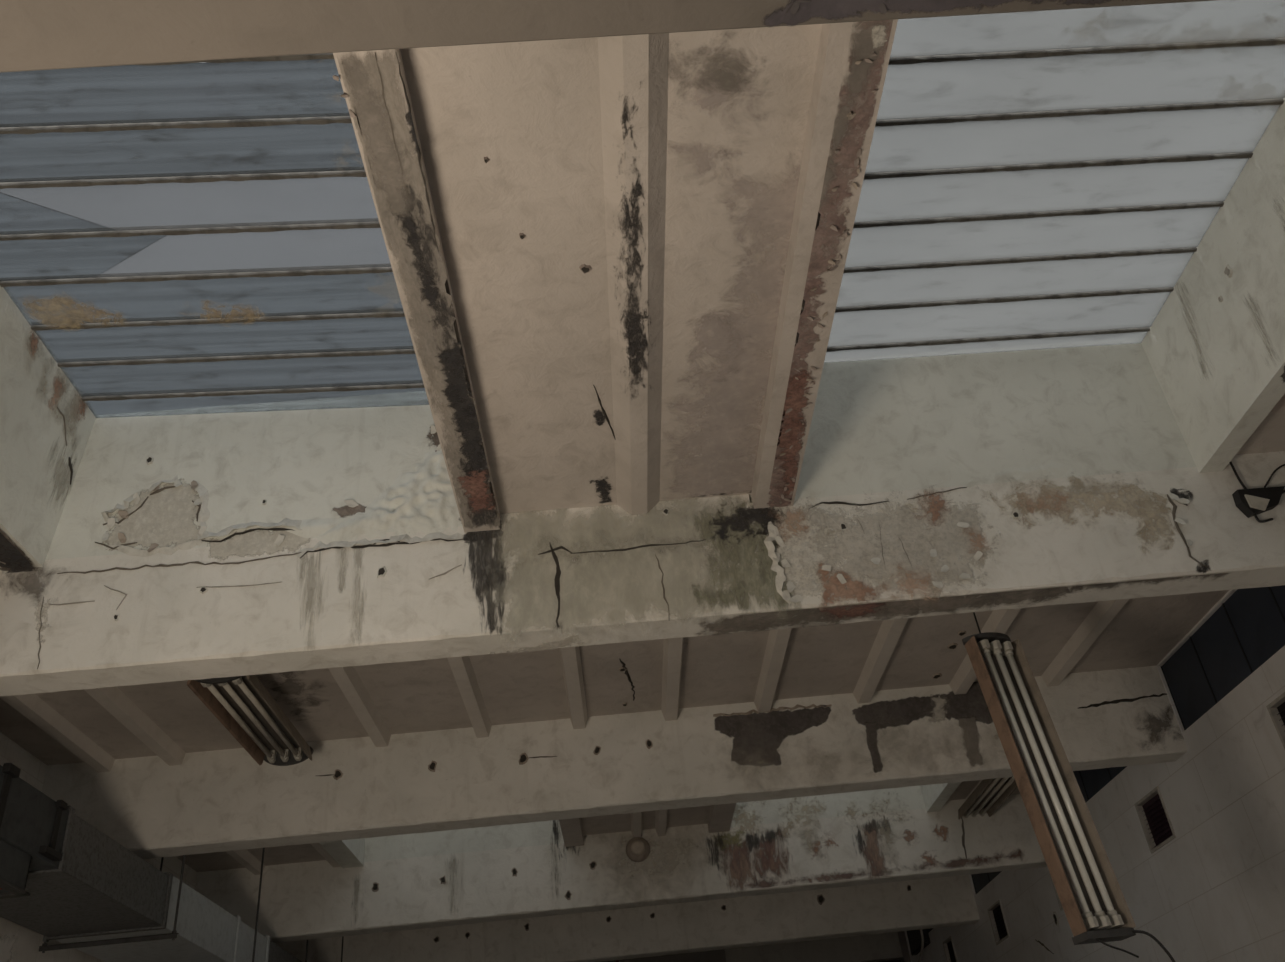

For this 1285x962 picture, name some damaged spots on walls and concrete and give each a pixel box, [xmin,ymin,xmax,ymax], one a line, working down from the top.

leakage [339,51,1228,639]
peeling [763,0,1123,610]
flaking render [95,475,310,560]
crack [538,539,706,633]
peeling [713,704,832,767]
peeling [853,673,993,773]